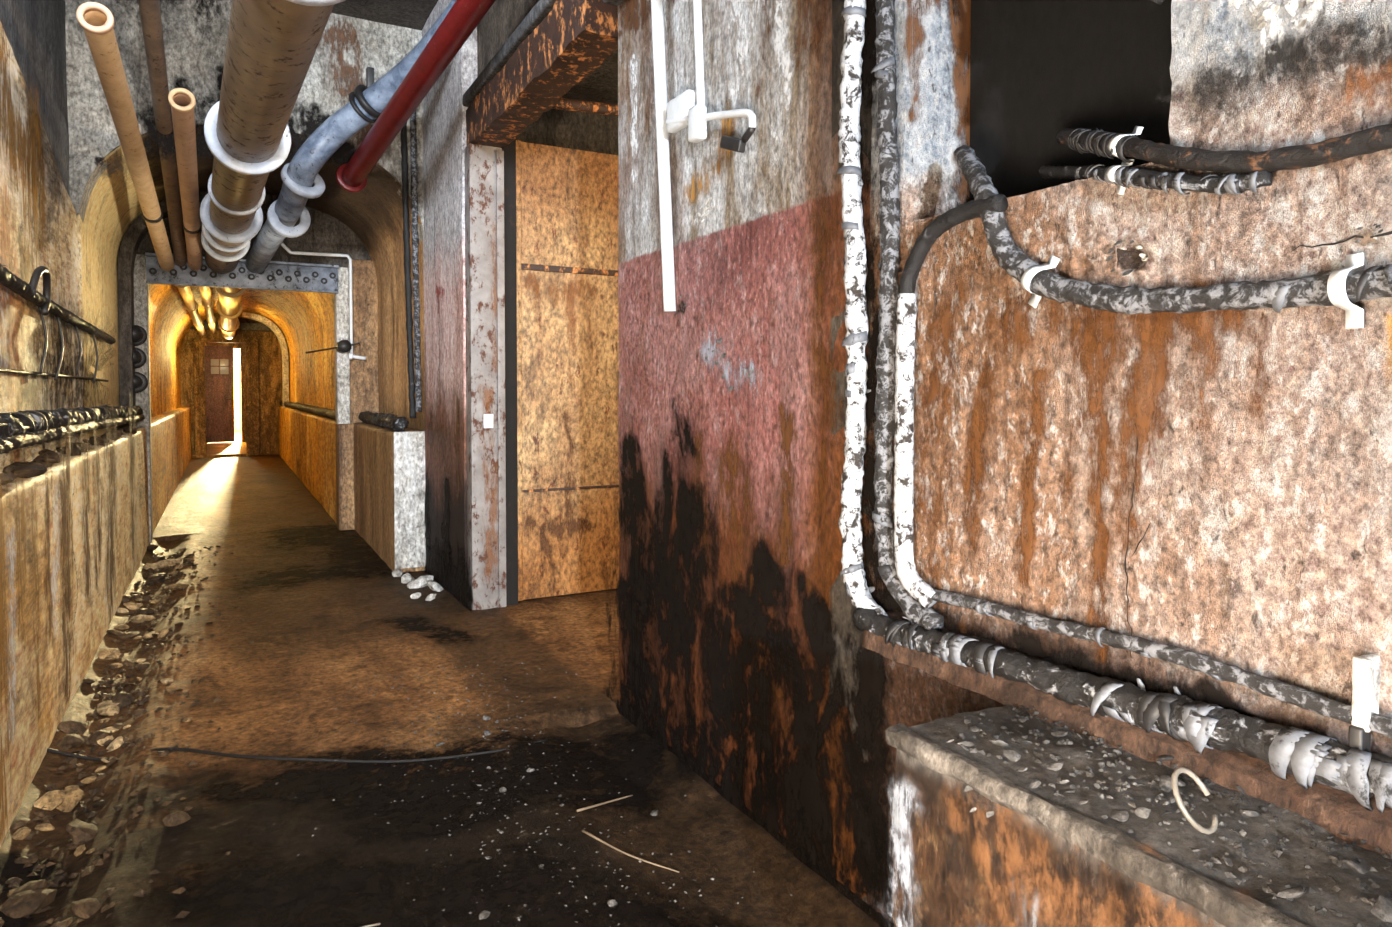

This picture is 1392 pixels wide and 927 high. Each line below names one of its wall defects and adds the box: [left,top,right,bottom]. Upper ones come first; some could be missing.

rust [2,185,19,391]
water stain [146,189,911,927]
rust [961,298,1032,550]
rust [1016,367,1047,585]
rust [1049,305,1245,663]
rust [1251,313,1267,417]